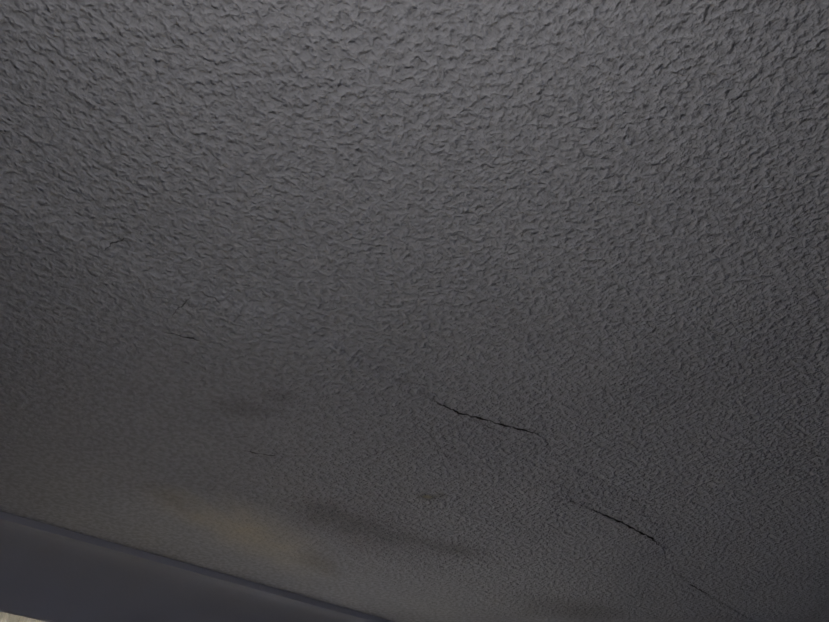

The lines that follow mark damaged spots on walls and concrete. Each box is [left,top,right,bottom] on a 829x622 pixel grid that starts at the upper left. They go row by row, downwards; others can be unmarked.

crack [434,399,536,434]
crack [561,498,658,545]